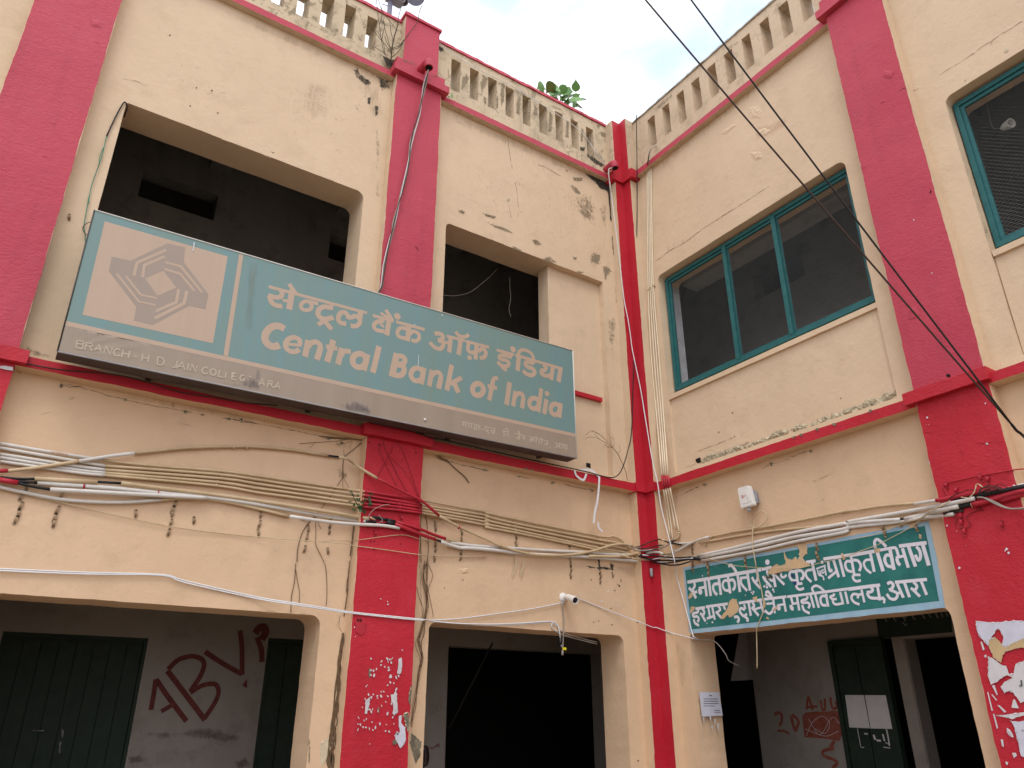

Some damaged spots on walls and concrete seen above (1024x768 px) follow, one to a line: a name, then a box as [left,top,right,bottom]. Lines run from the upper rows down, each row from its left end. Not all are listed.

spalling [590,251,610,280]
spalling [696,390,897,463]
spalling [403,685,422,764]